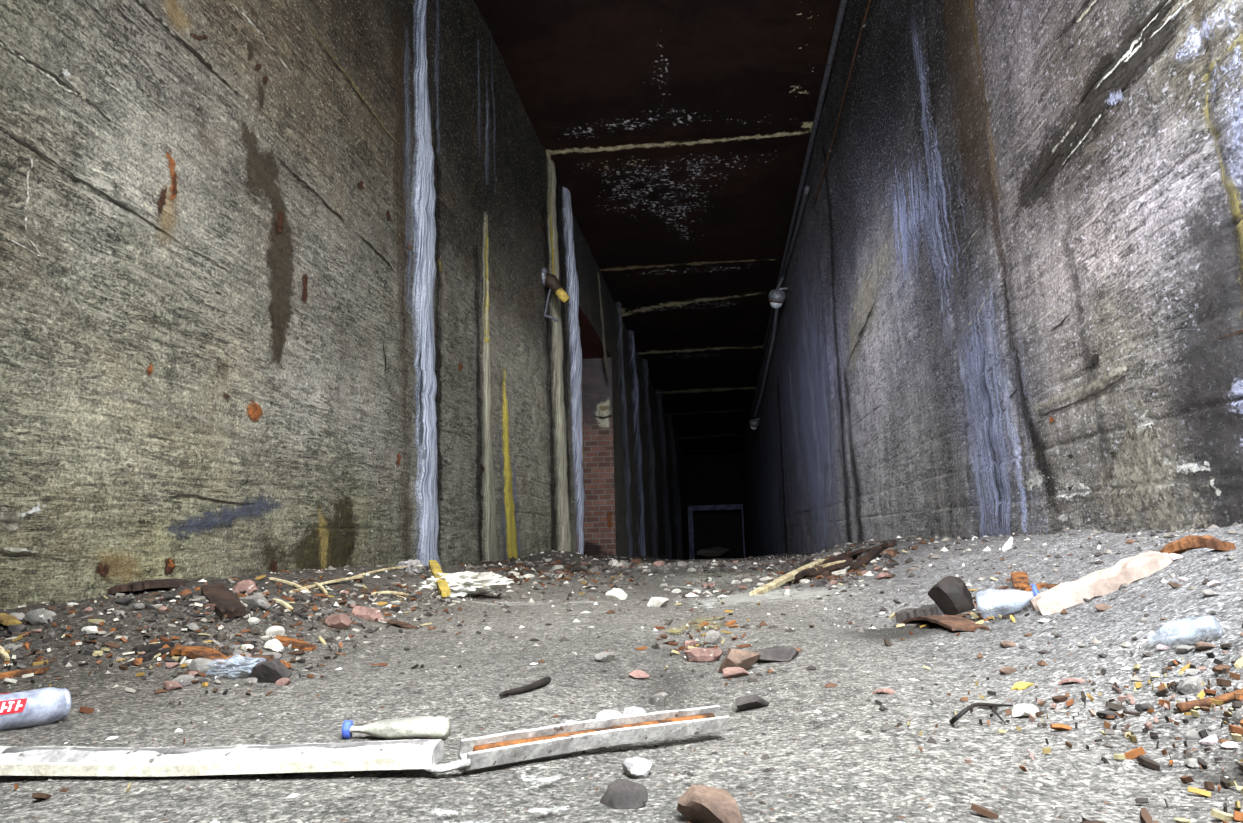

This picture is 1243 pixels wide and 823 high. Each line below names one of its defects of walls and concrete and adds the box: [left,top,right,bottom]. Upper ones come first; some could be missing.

rust [157,151,178,215]
rust [247,399,263,421]
water stain [241,122,308,364]
water stain [403,0,442,566]
water stain [542,44,844,560]
water stain [1161,0,1243,527]